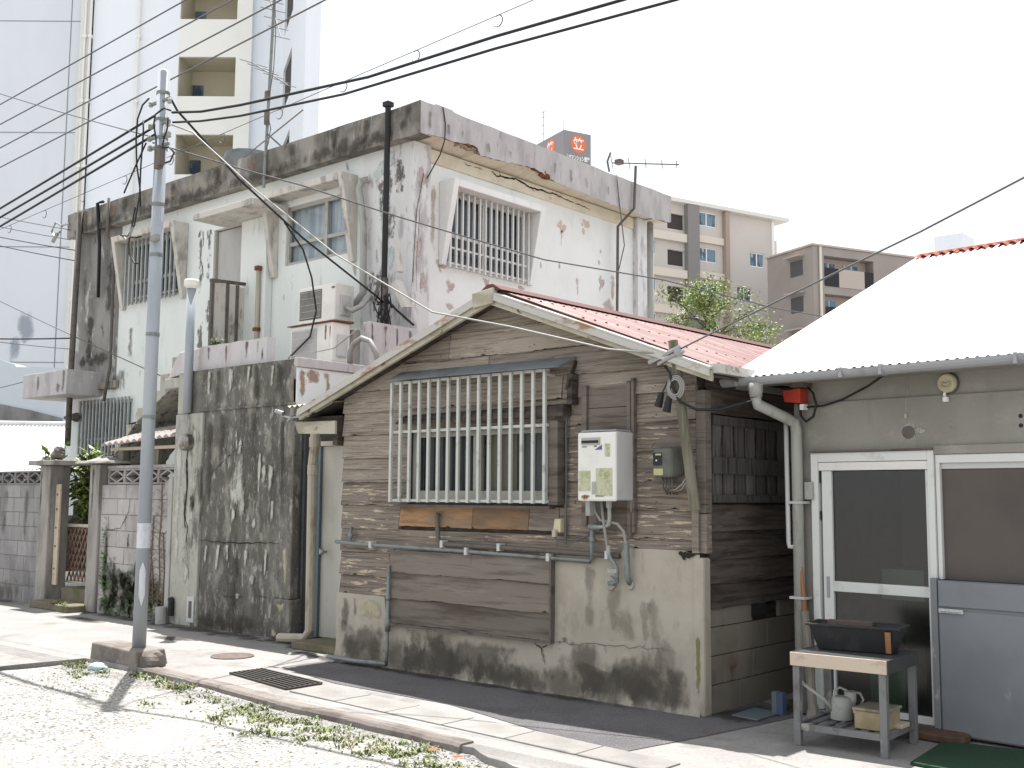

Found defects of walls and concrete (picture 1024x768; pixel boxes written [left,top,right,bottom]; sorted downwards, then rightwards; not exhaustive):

leakage [312,120,384,160]
spalling [454,142,478,155]
leakage [165,145,294,206]
leakage [378,159,405,237]
crack [465,163,590,210]
leakage [367,273,411,345]
leakage [80,317,107,366]
peeling [300,370,330,396]
leakage [207,414,224,498]
leakage [342,602,677,711]
crack [535,641,669,662]